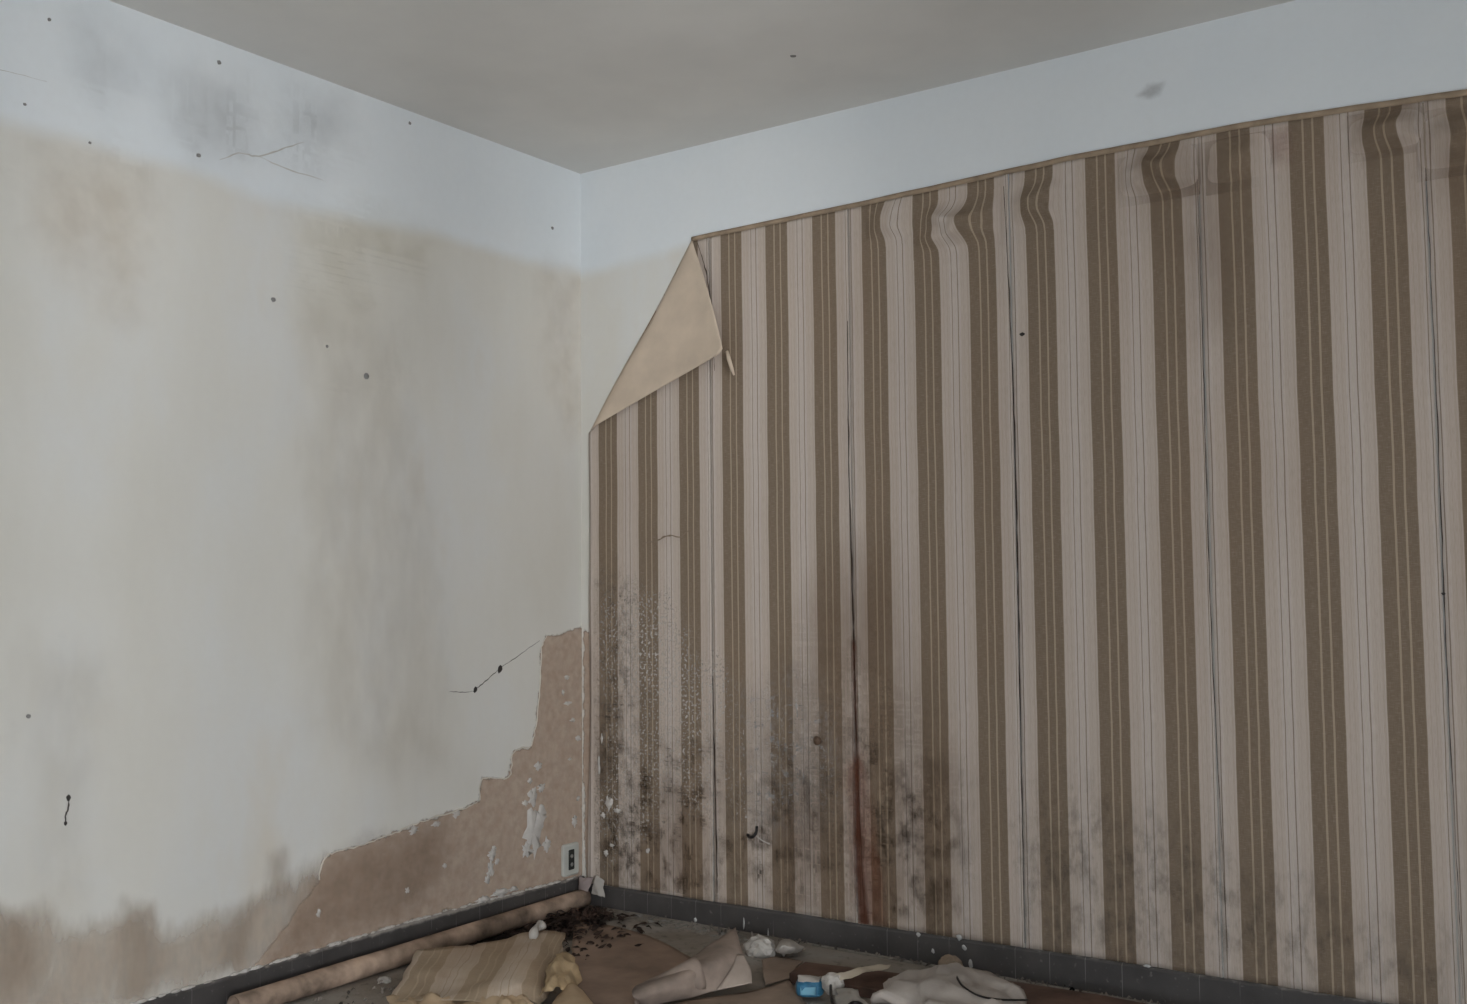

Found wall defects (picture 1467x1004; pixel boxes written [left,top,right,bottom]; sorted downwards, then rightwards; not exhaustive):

peeling [590,240,723,430]
peeling [255,628,590,966]
crack [450,641,539,693]
water stain [597,595,835,889]
water stain [0,878,319,1004]